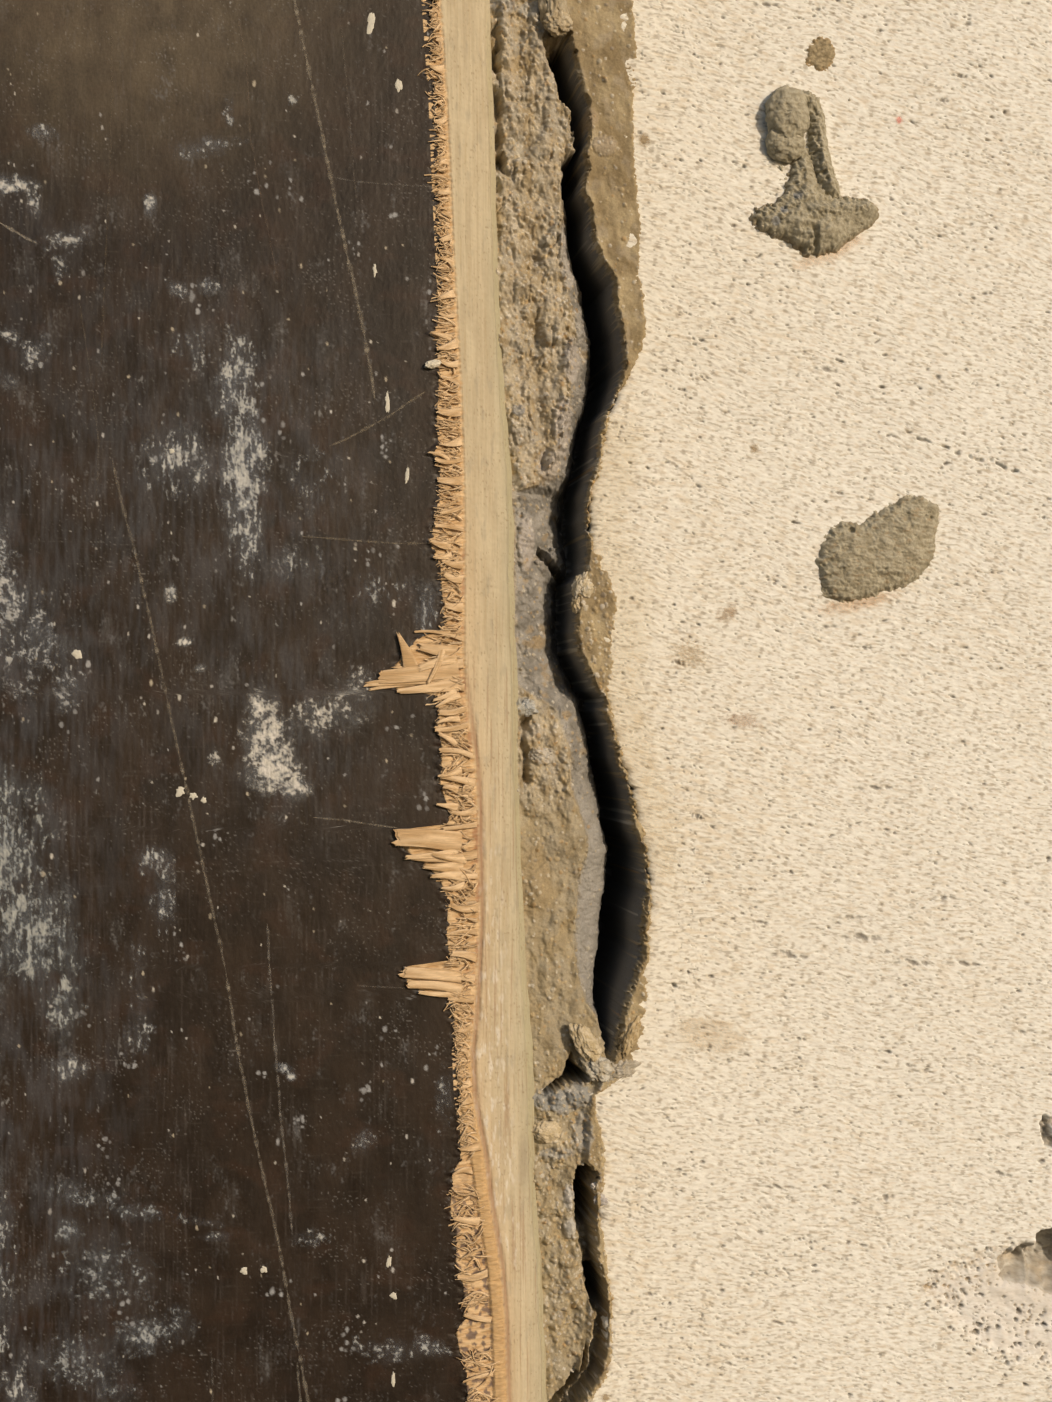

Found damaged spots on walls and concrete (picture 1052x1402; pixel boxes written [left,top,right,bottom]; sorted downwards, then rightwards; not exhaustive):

water stain [0,173,41,209]
water stain [143,335,272,578]
water stain [0,539,84,708]
crack [512,30,652,1082]
water stain [242,667,371,795]
water stain [0,771,88,1027]
spalling [1032,1094,1052,1156]
water stain [2,1335,118,1400]
water stain [55,1220,146,1299]
water stain [116,1309,180,1354]
crack [547,1162,611,1402]
spalling [908,1229,1052,1377]